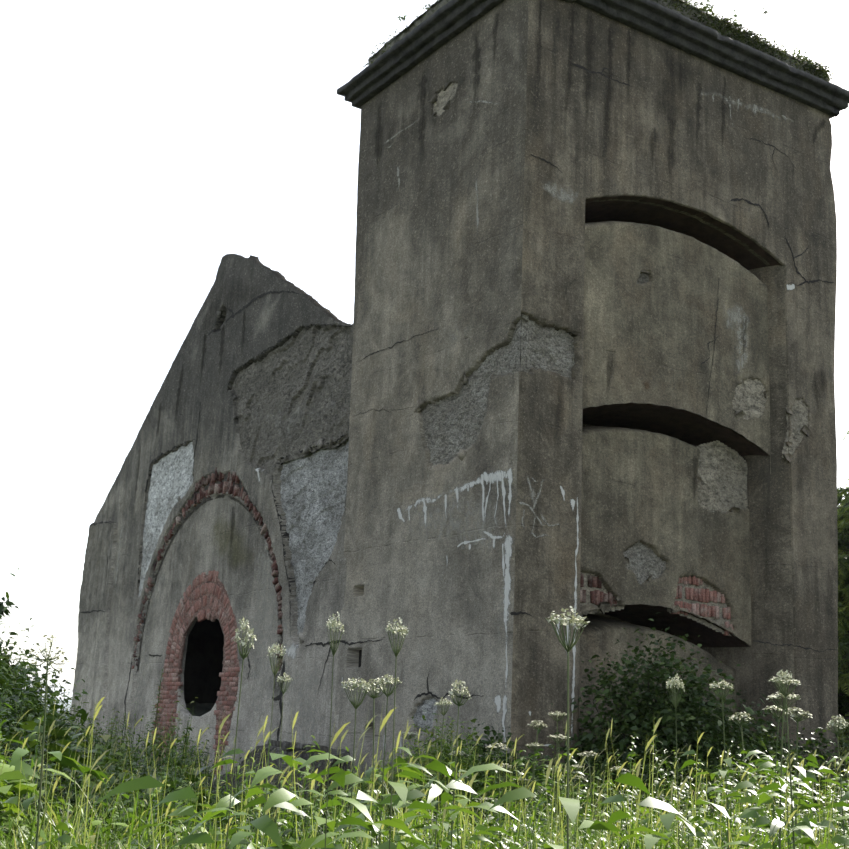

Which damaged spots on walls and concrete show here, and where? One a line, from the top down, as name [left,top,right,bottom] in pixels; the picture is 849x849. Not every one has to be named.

crack [731,198,834,286]
spalling [414,314,575,466]
peeling [732,378,769,421]
peeling [138,442,194,597]
spalling [232,323,353,643]
peeling [696,440,748,514]
efflorescence [397,468,558,682]
efflorescence [556,486,579,733]
spalling [580,572,625,616]
spalling [667,576,736,637]
crack [413,670,484,701]
efflorescence [494,695,507,750]